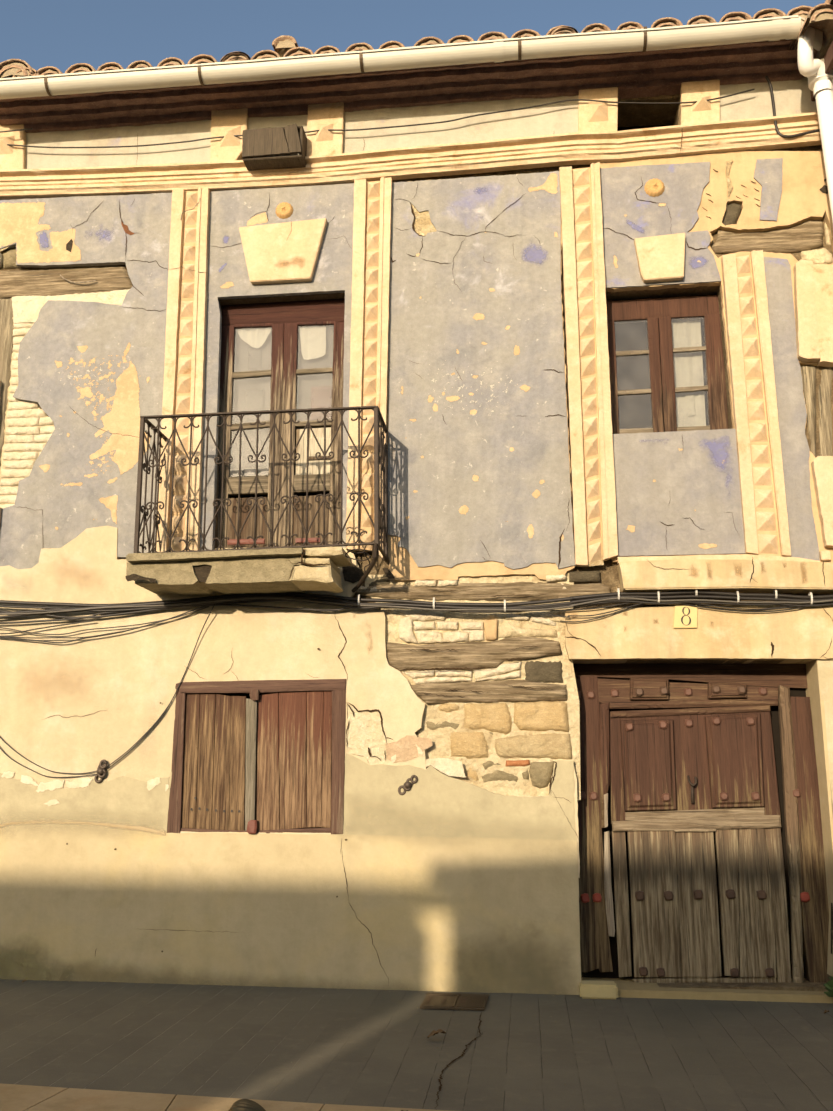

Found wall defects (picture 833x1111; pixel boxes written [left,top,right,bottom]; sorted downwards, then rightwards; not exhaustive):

peeling [0,202,81,267]
crack [391,182,540,289]
flaking render [722,160,741,226]
flaking render [0,289,150,524]
peeling [427,349,531,415]
spalling [347,550,610,800]
peeling [1,771,92,806]
peeling [146,777,169,792]
crack [340,840,389,982]
crack [435,1014,482,1109]